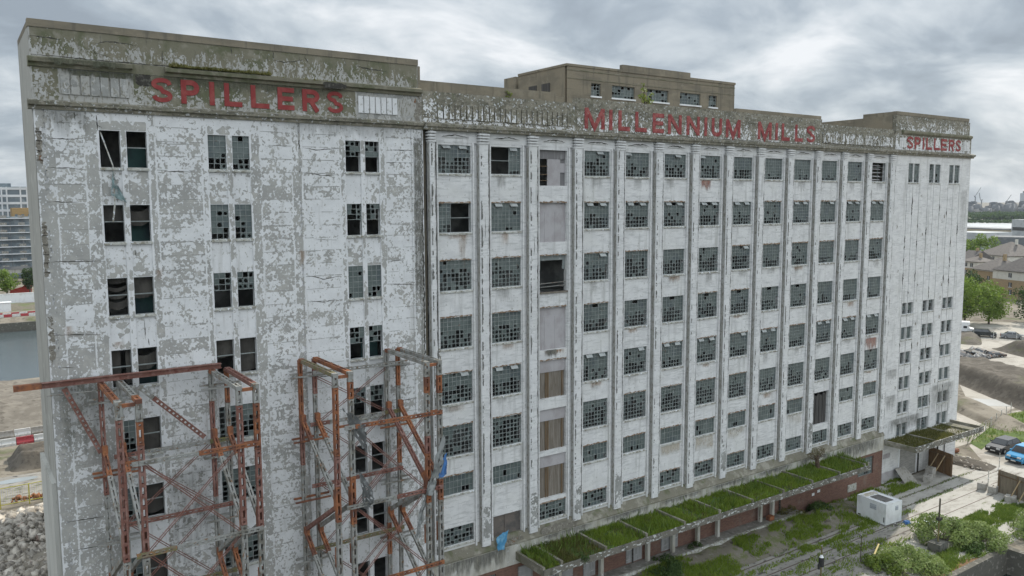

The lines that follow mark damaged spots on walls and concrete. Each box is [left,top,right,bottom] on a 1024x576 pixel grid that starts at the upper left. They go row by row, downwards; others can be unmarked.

peeling [29,26,970,154]
peeling [35,109,434,576]